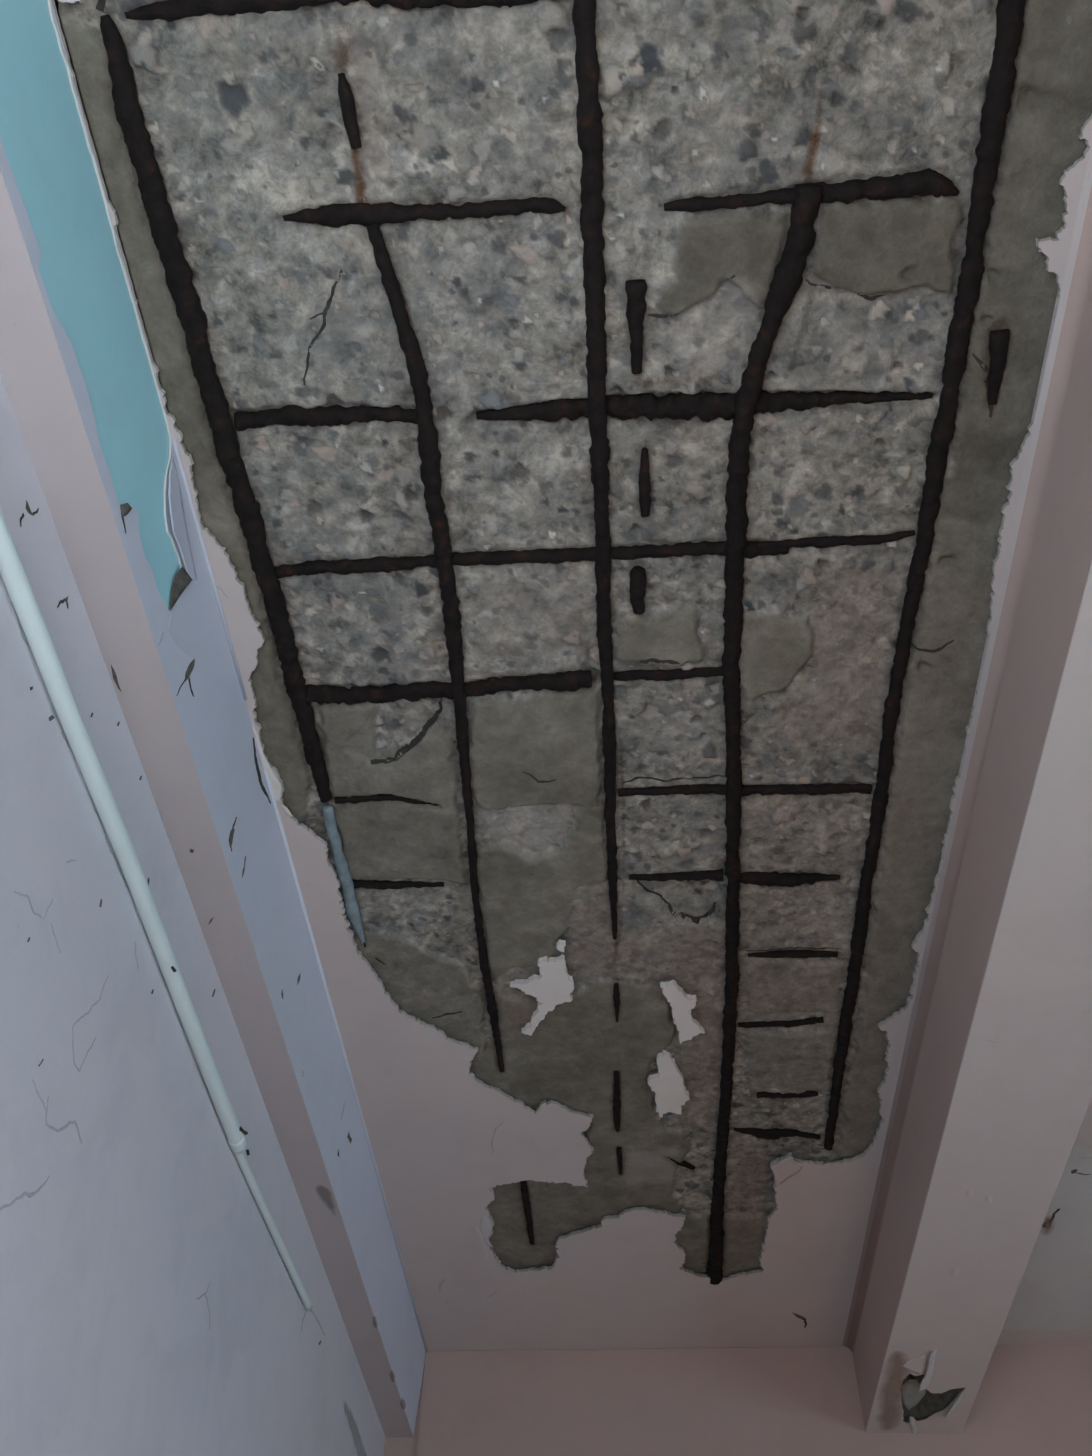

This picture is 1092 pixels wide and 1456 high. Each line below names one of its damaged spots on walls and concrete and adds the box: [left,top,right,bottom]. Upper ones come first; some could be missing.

rust [352,149,365,203]
rust [805,126,818,174]
spalling [0,0,733,1279]
spalling [595,0,1092,1282]
peeling [1002,1146,1092,1330]
spalling [901,1349,966,1434]